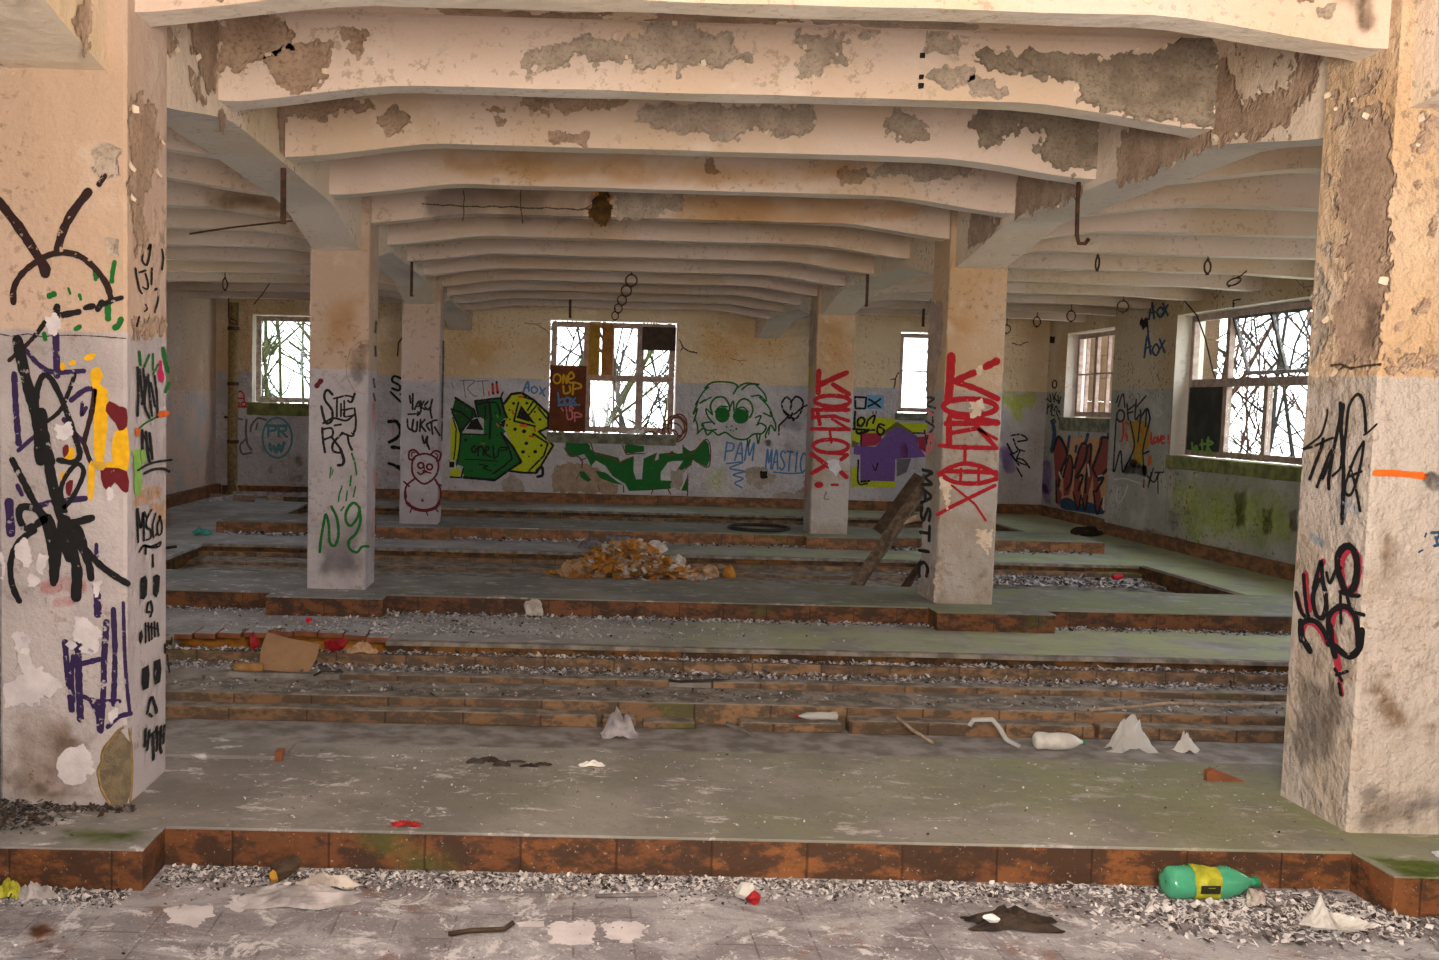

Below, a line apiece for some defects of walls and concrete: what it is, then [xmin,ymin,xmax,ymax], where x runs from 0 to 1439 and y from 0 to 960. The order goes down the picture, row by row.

peeling [71,0,93,58]
peeling [167,0,413,157]
peeling [90,90,165,258]
peeling [426,8,1439,377]